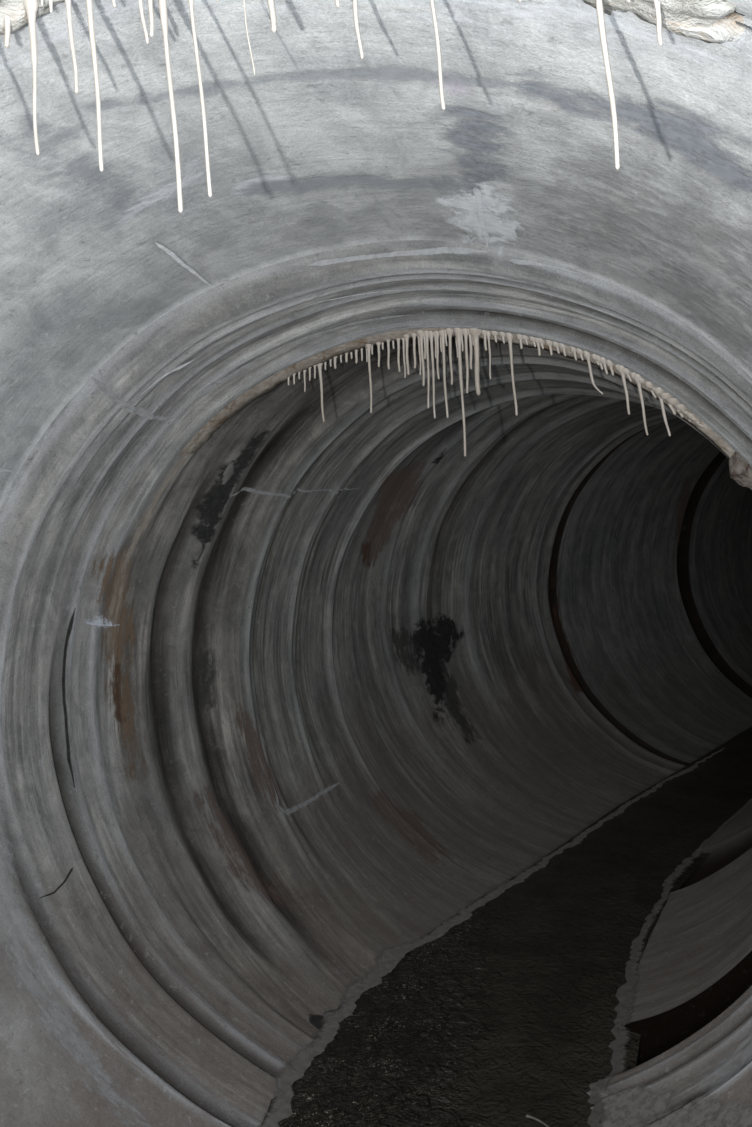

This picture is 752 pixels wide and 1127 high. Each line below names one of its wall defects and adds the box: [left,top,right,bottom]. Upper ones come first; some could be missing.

water stain [0,0,65,35]
water stain [580,0,745,44]
water stain [134,81,239,104]
water stain [288,68,752,192]
water stain [85,314,735,644]
crack [62,609,75,788]
corrosion [92,550,145,778]
water stain [389,616,481,744]